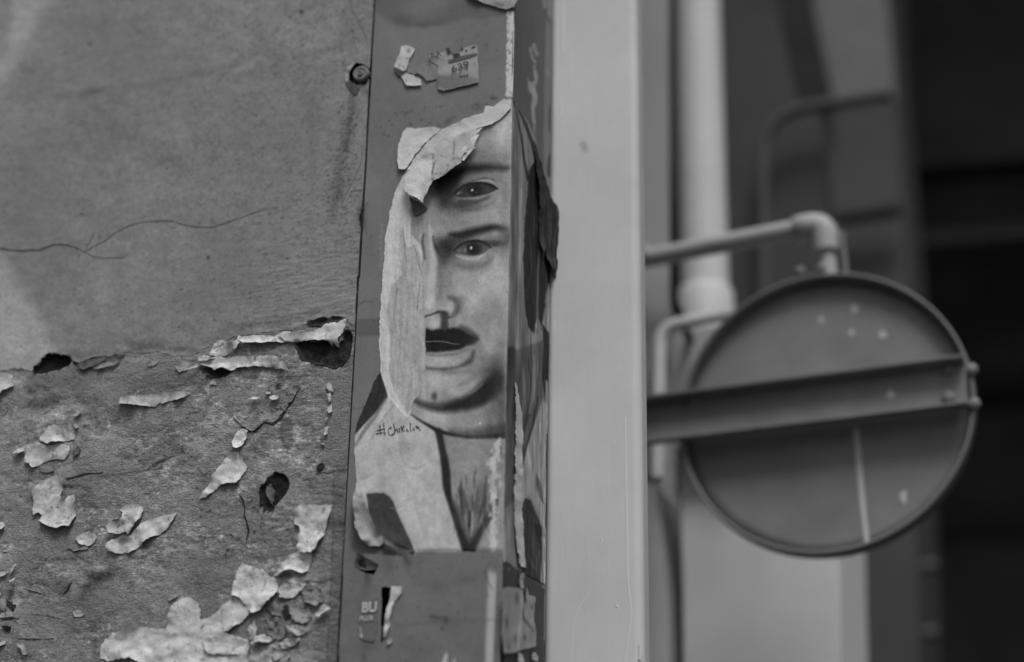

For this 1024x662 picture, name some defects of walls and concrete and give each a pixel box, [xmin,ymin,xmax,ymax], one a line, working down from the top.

crack [0,205,284,258]
peeling [0,373,14,393]
peeling [73,352,126,370]
peeling [118,390,188,407]
peeling [175,319,346,498]
peeling [13,409,83,528]
flaking render [266,484,275,506]
peeling [66,503,176,554]
peeling [0,564,17,618]
peeling [100,504,332,662]
peeling [0,640,28,655]